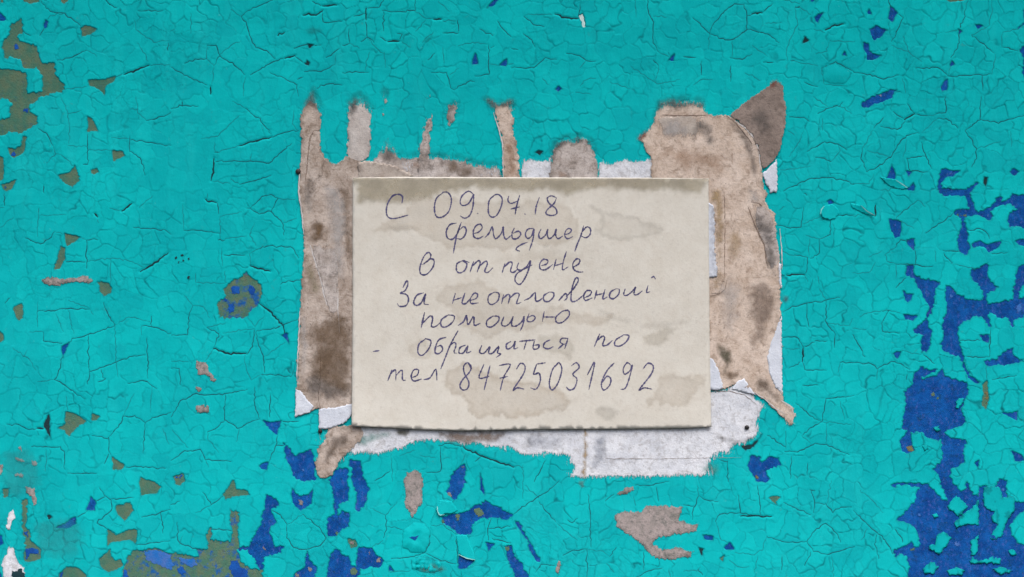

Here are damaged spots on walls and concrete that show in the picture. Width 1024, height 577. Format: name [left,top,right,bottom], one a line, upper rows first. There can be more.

peeling [0,0,65,191]
peeling [217,273,262,319]
crack [9,0,630,534]
crack [631,0,1024,479]
peeling [889,169,1024,577]
crack [137,493,231,550]
peeling [100,495,284,577]
crack [272,510,326,550]
peeling [294,460,393,577]
peeling [437,465,540,569]
crack [372,443,703,577]
crack [687,481,903,577]